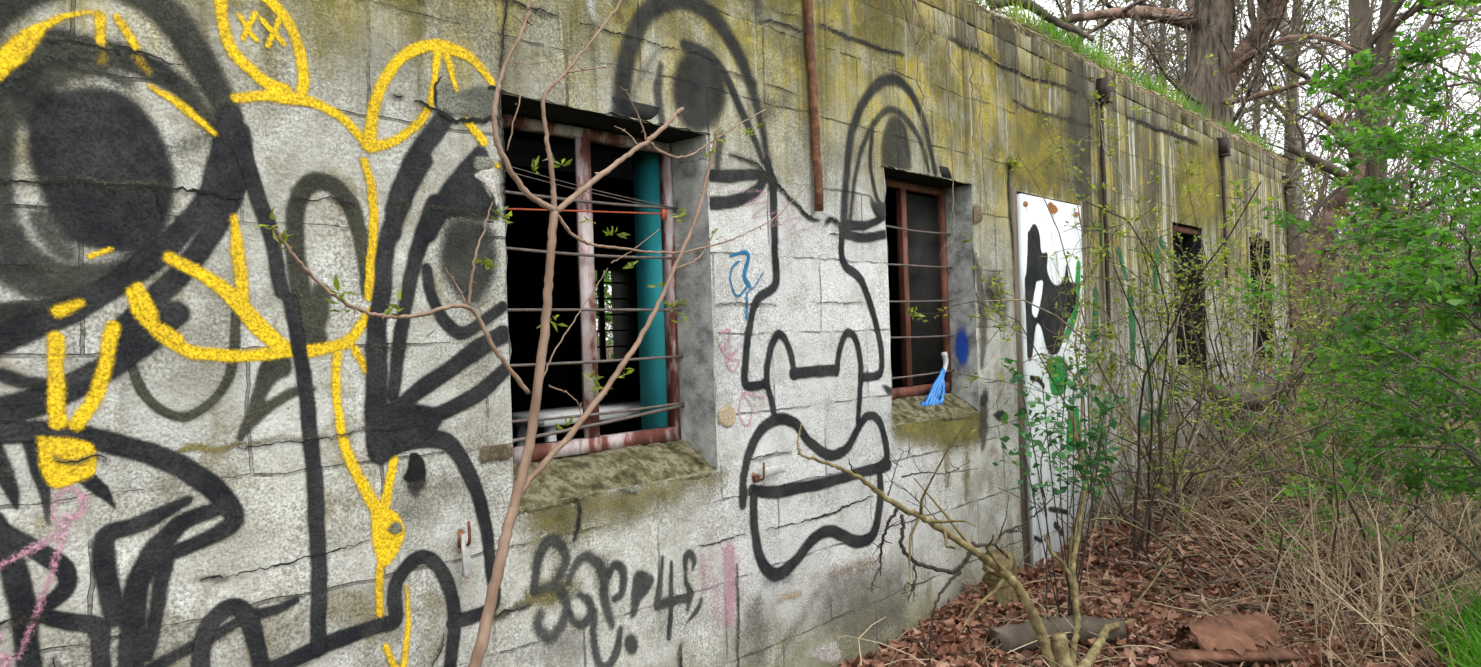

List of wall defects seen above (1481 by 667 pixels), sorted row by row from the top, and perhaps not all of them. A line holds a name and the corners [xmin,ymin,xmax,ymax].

water stain [588,0,628,25]
water stain [1027,55,1091,231]
crack [0,176,241,220]
water stain [974,256,1006,369]
water stain [945,390,988,498]
crack [0,616,42,627]